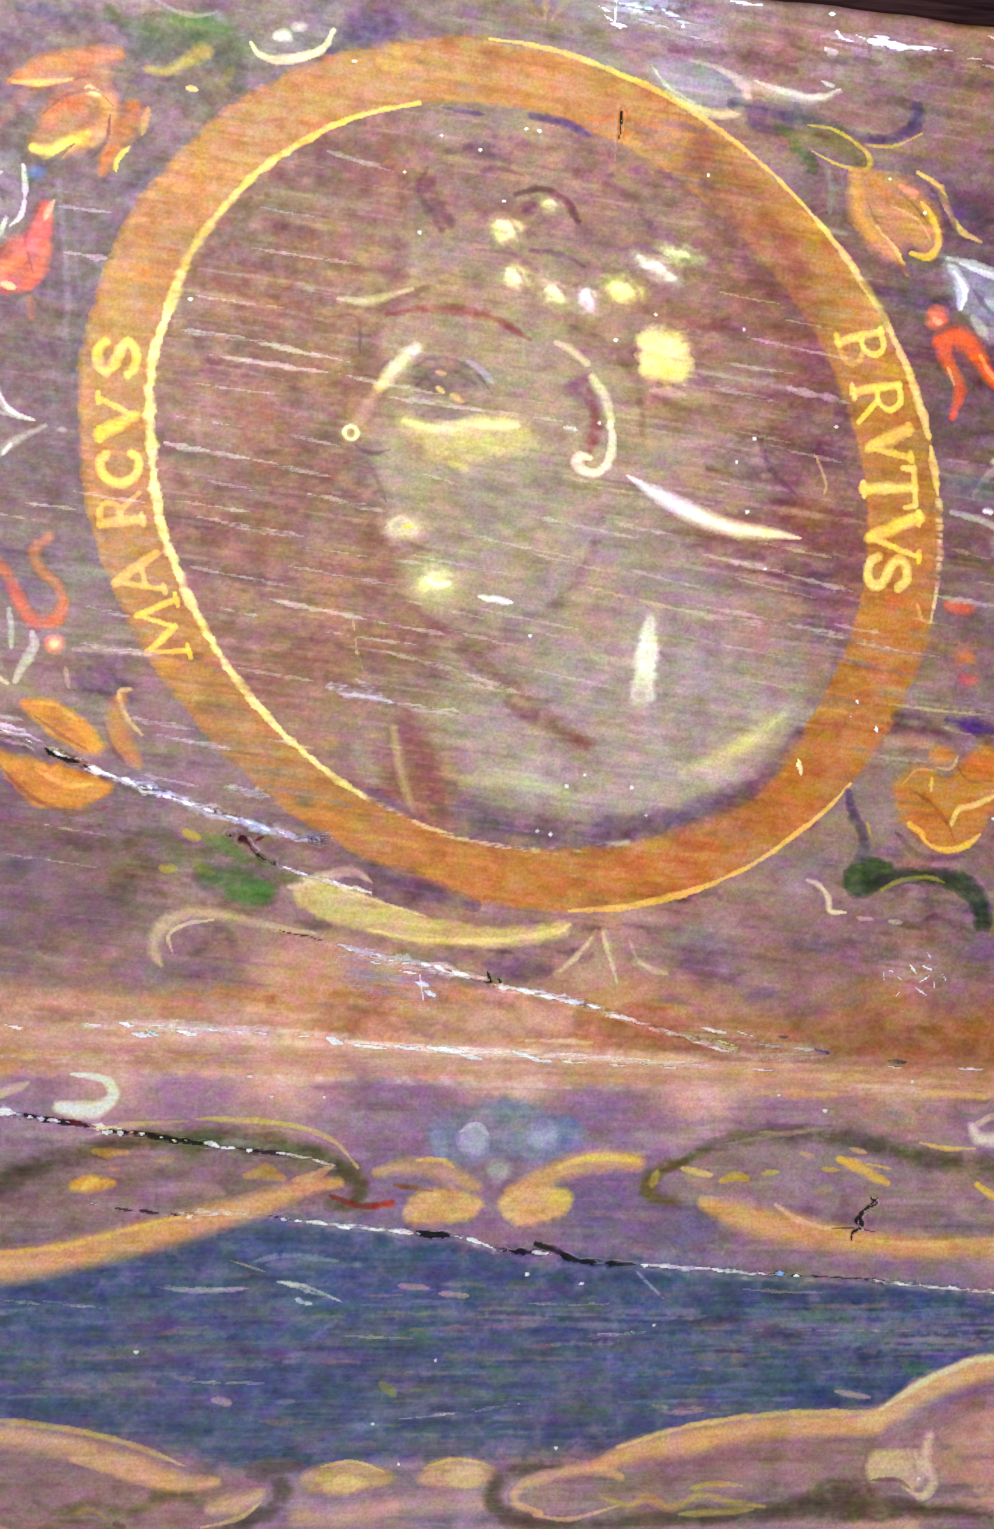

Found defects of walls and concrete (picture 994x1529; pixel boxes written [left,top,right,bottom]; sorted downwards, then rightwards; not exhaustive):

crack [0,722,372,894]
crack [279,929,738,1049]
crack [0,1104,336,1166]
crack [90,1197,994,1294]